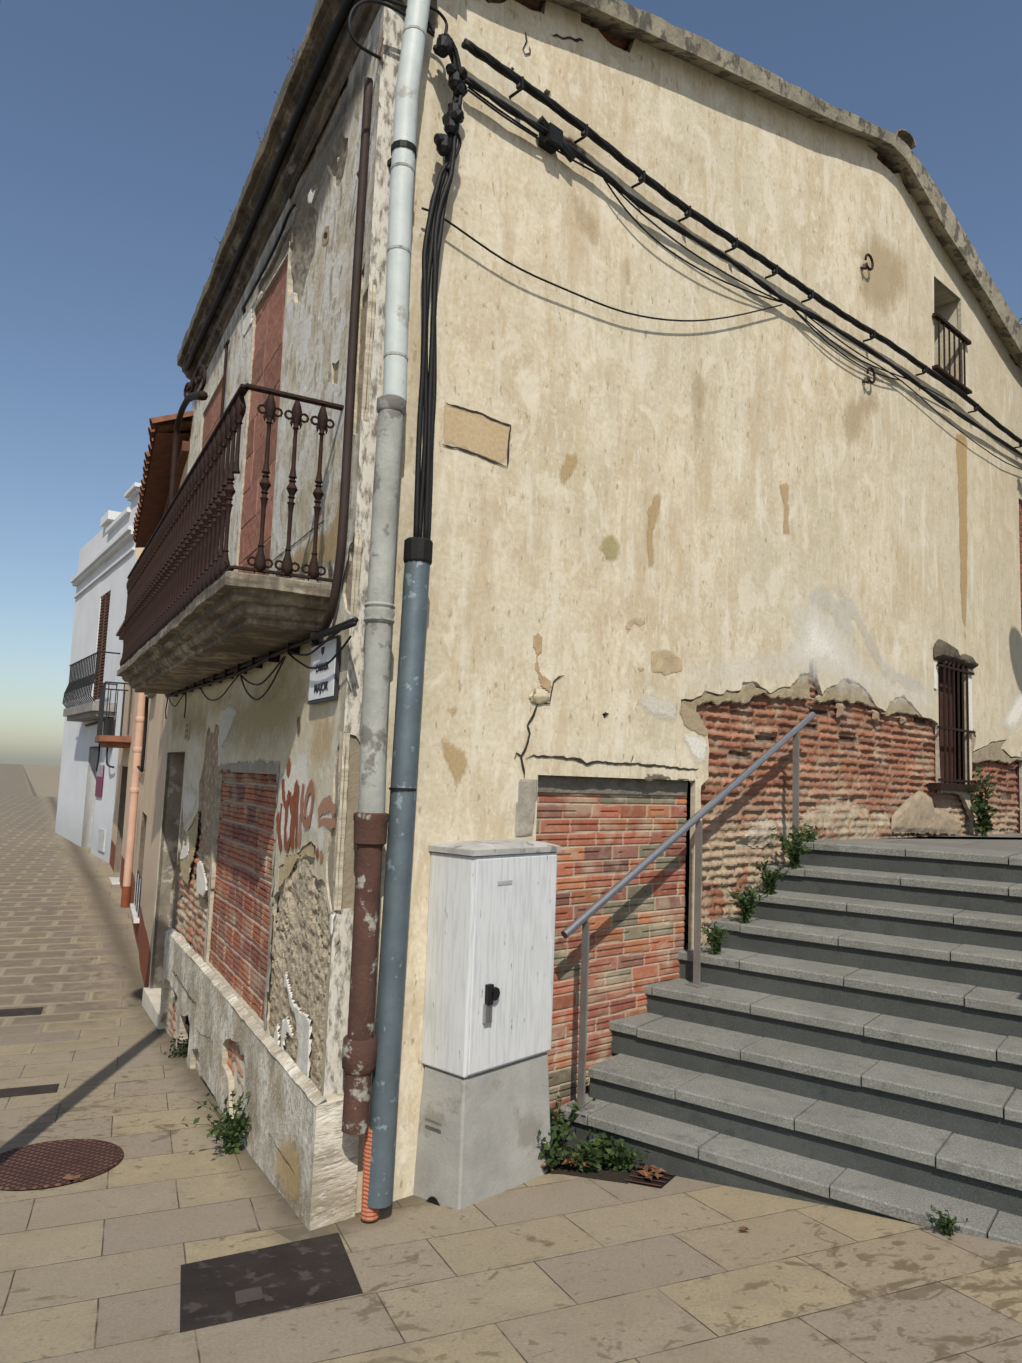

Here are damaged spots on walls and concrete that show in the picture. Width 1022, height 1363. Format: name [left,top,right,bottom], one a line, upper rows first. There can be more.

flaking render [256,75,349,312]
flaking render [173,726,223,960]
flaking render [268,729,360,1093]
crack [515,633,699,778]
flaking render [645,664,1020,947]
spalling [163,982,204,1081]
flaking render [227,1040,245,1101]